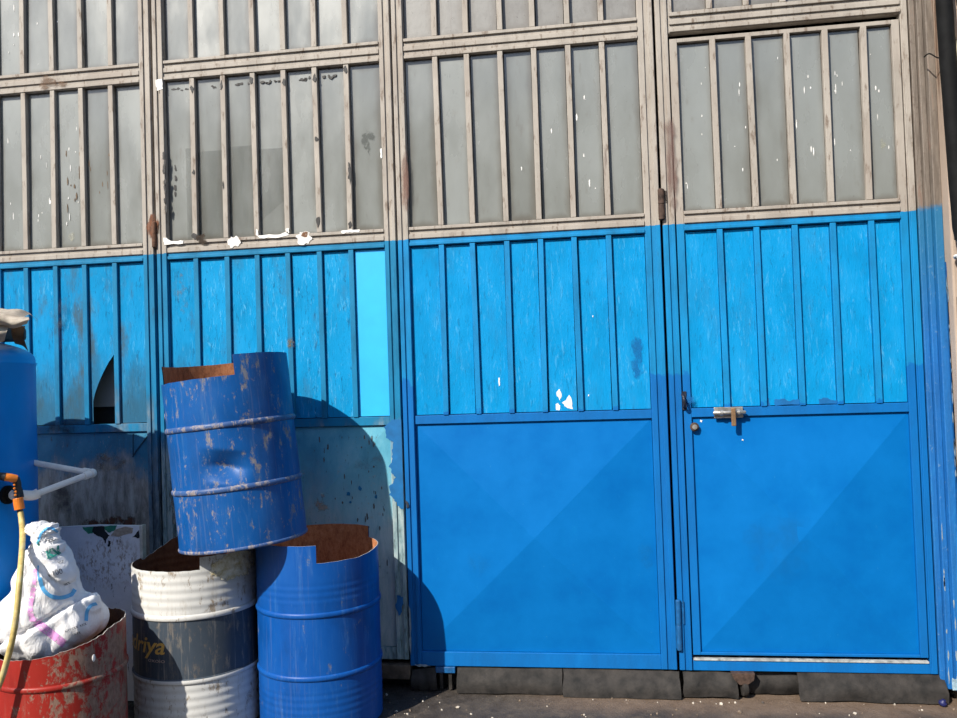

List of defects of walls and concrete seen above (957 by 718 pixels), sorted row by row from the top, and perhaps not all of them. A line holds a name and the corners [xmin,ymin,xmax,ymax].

peeling [555,389,573,410]